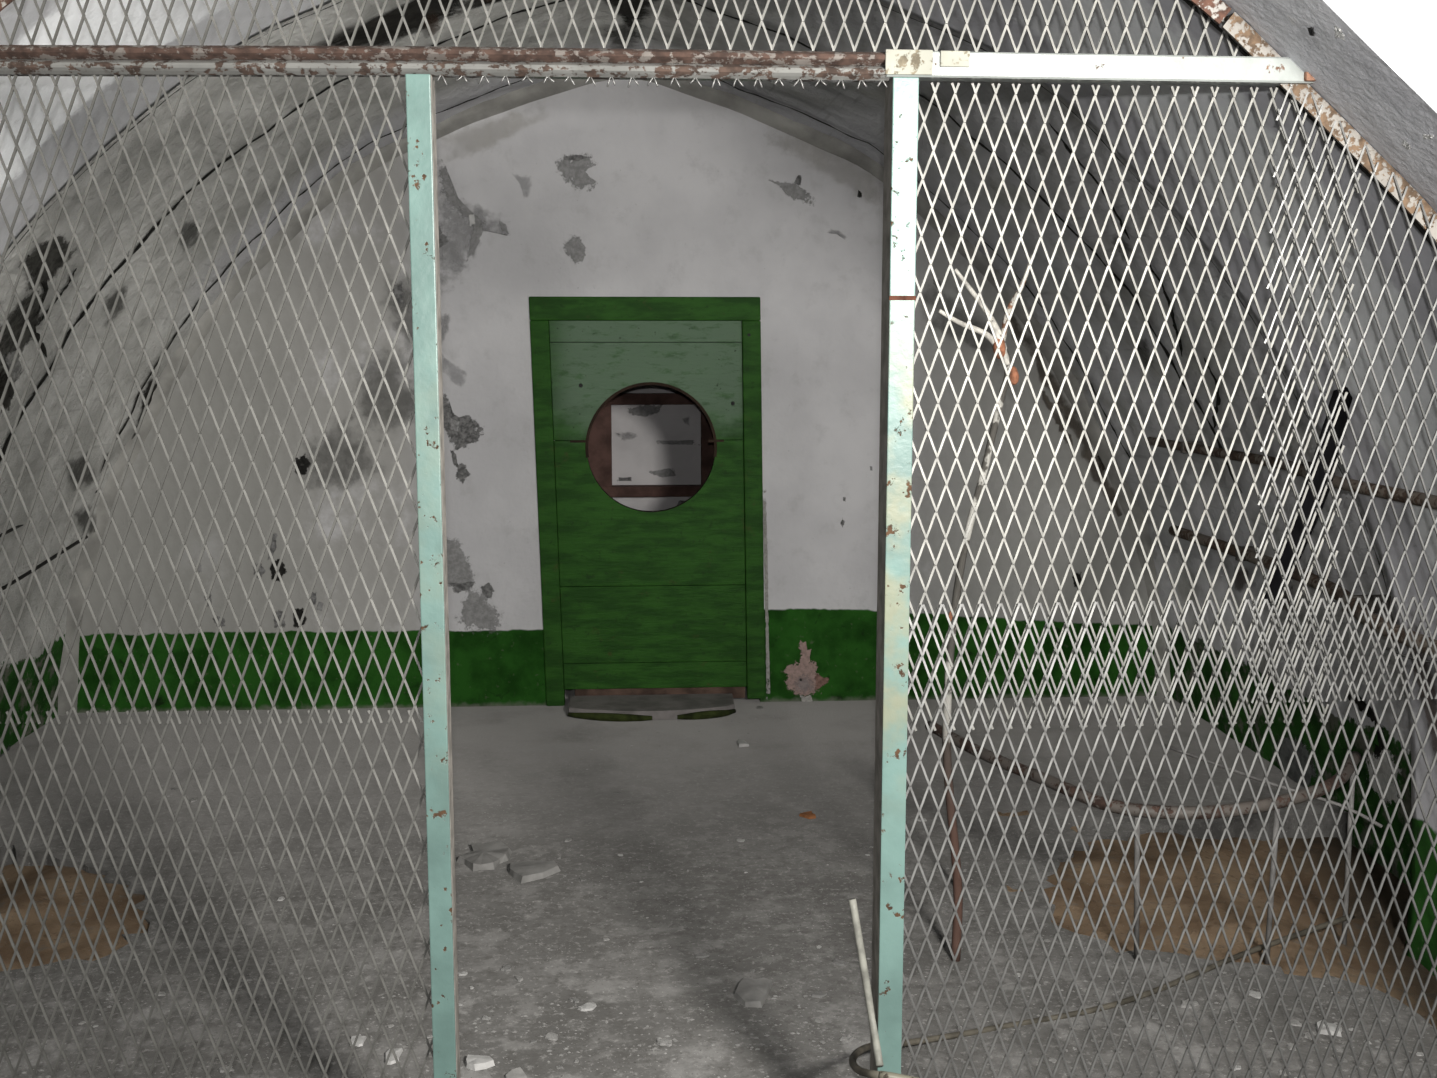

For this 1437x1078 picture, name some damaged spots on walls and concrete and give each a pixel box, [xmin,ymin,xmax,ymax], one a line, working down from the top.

peeling [440,166,508,261]
peeling [564,235,585,263]
peeling [555,155,596,191]
spalling [769,175,812,204]
spalling [443,395,484,483]
spalling [447,540,501,631]
spalling [763,491,829,702]